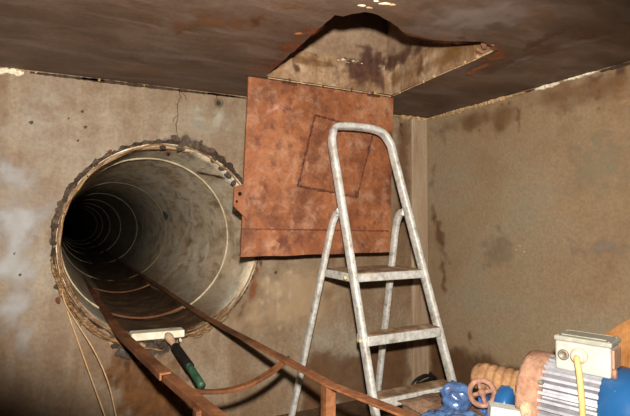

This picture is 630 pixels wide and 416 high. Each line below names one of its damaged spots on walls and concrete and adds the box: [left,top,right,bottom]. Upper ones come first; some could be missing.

peeling [0,67,25,77]
spalling [268,41,494,97]
leakage [346,44,421,85]
crack [30,71,246,135]